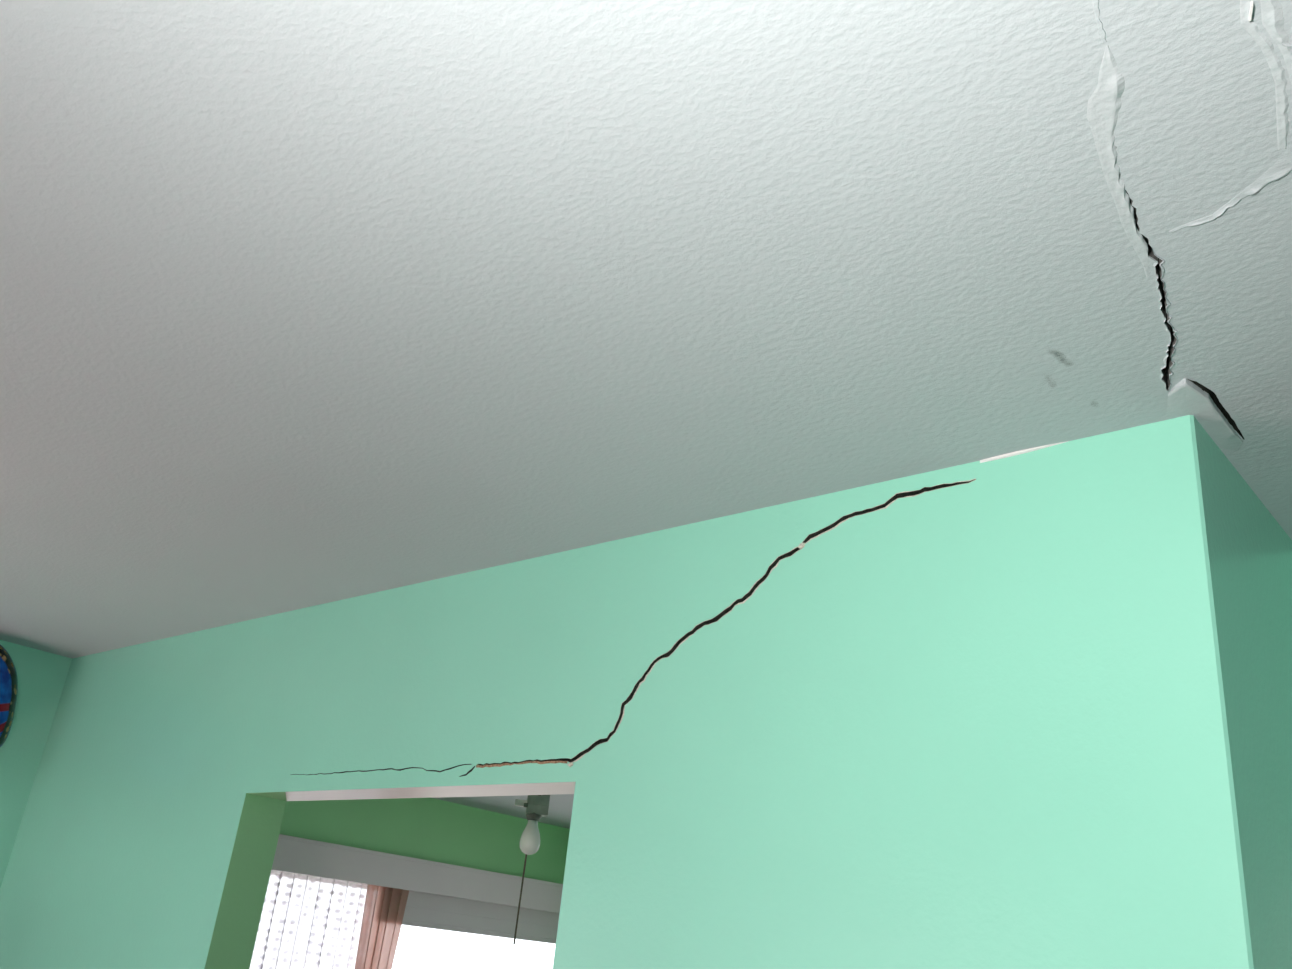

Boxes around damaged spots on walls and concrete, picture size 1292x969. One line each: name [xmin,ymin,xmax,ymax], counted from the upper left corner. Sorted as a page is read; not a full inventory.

crack [1087,0,1244,451]
peeling [1169,0,1292,233]
crack [291,478,976,777]